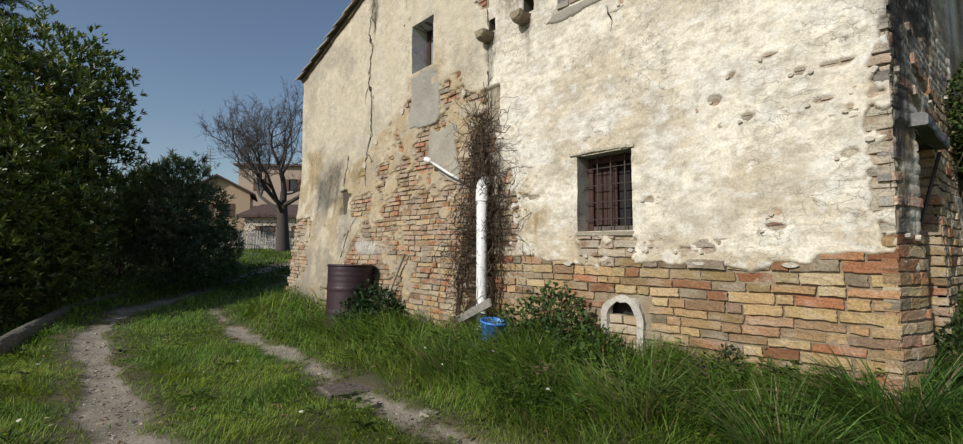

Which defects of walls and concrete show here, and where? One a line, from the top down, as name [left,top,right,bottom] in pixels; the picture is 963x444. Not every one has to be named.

crack [344,1,376,186]
water stain [890,0,930,157]
flaking render [286,215,312,290]
flaking render [342,0,963,410]